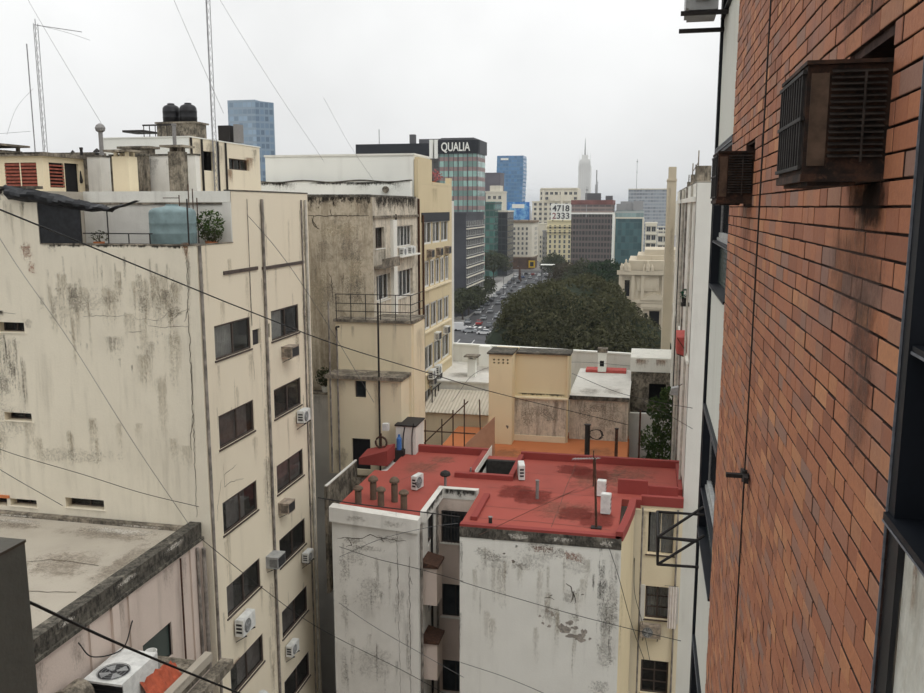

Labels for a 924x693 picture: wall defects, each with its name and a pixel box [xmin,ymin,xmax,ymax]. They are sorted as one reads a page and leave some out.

leakage [307,182,415,210]
crack [337,509,412,692]
peeling [538,609,591,643]